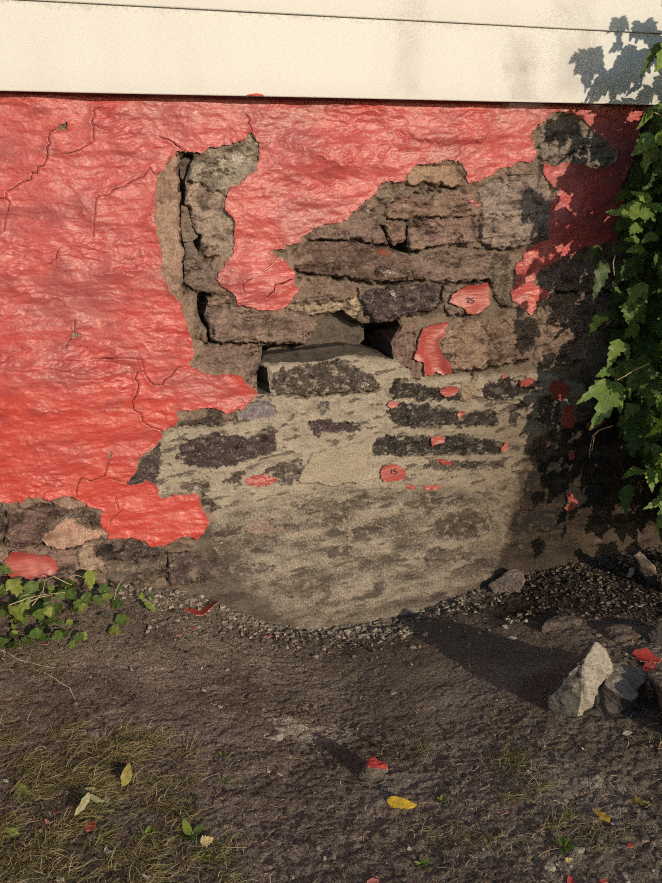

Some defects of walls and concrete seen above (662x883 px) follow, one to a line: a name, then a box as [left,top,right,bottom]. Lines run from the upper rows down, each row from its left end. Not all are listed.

crack [0,107,112,230]
crack [96,358,185,430]
spalling [0,105,662,630]